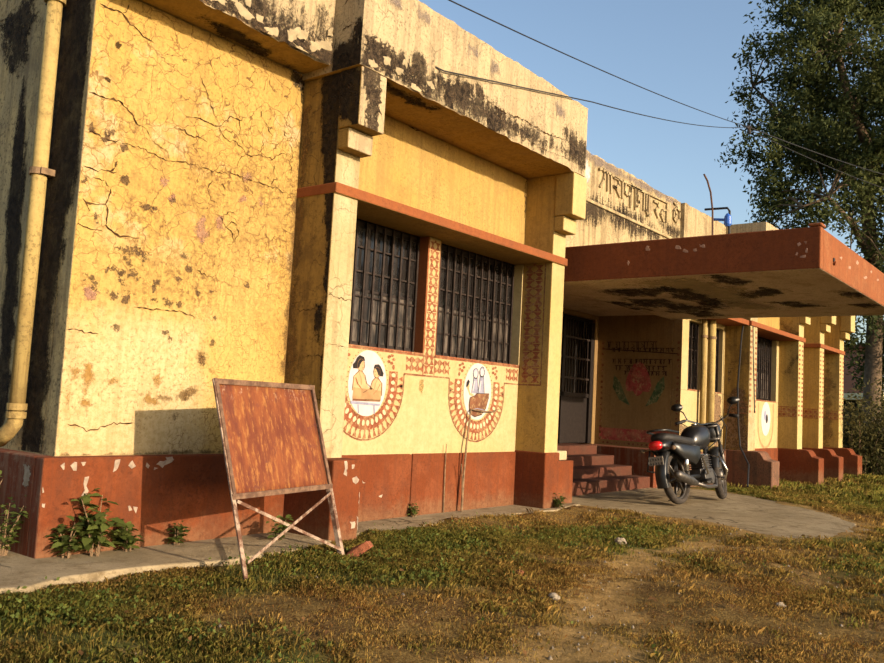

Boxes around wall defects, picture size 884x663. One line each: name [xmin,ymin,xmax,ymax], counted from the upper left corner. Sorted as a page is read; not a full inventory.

crack [101,4,154,43]
peeling [202,0,333,58]
spalling [88,122,116,142]
crack [78,72,293,242]
water stain [0,0,39,427]
water stain [21,0,93,453]
water stain [195,0,680,410]
spalling [82,246,149,304]
spalling [151,280,182,308]
water stain [599,274,826,318]
water stain [162,386,196,401]
peeling [61,462,89,496]